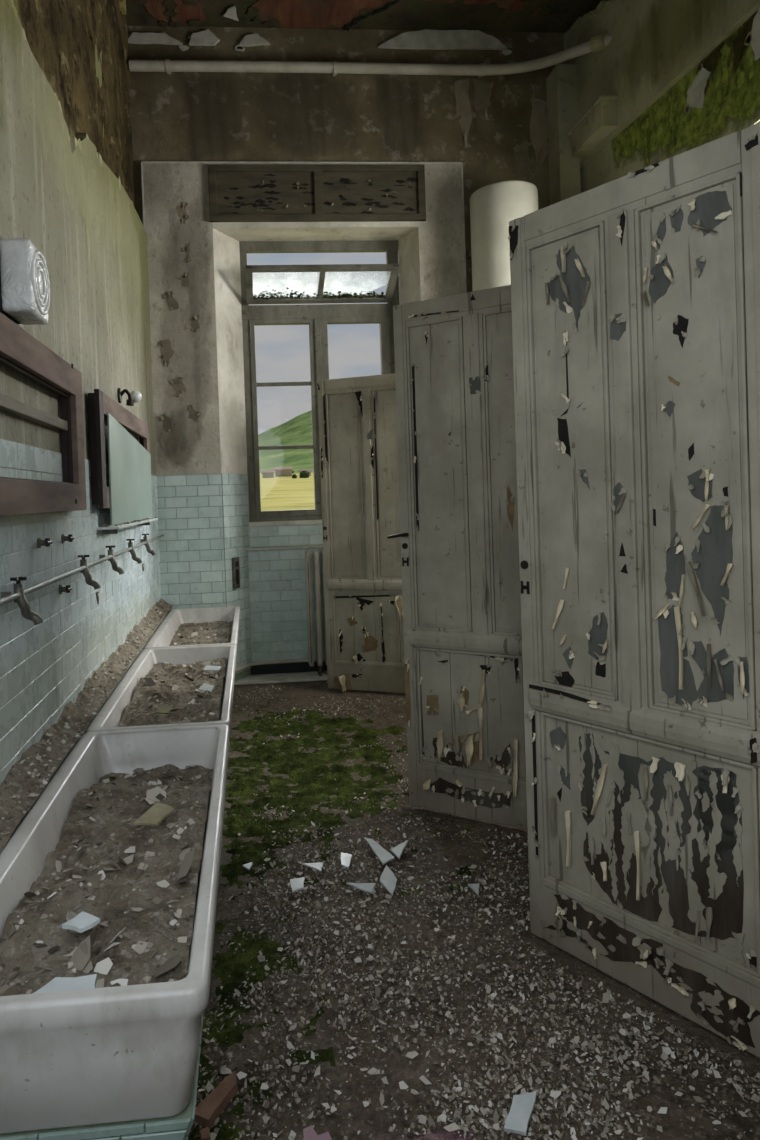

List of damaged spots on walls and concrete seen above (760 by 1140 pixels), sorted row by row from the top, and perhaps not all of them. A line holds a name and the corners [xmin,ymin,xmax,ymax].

spalling [223,0,390,30]
water stain [702,10,758,93]
spalling [744,8,760,60]
spalling [10,0,207,206]
peeling [455,78,472,148]
spalling [684,63,711,114]